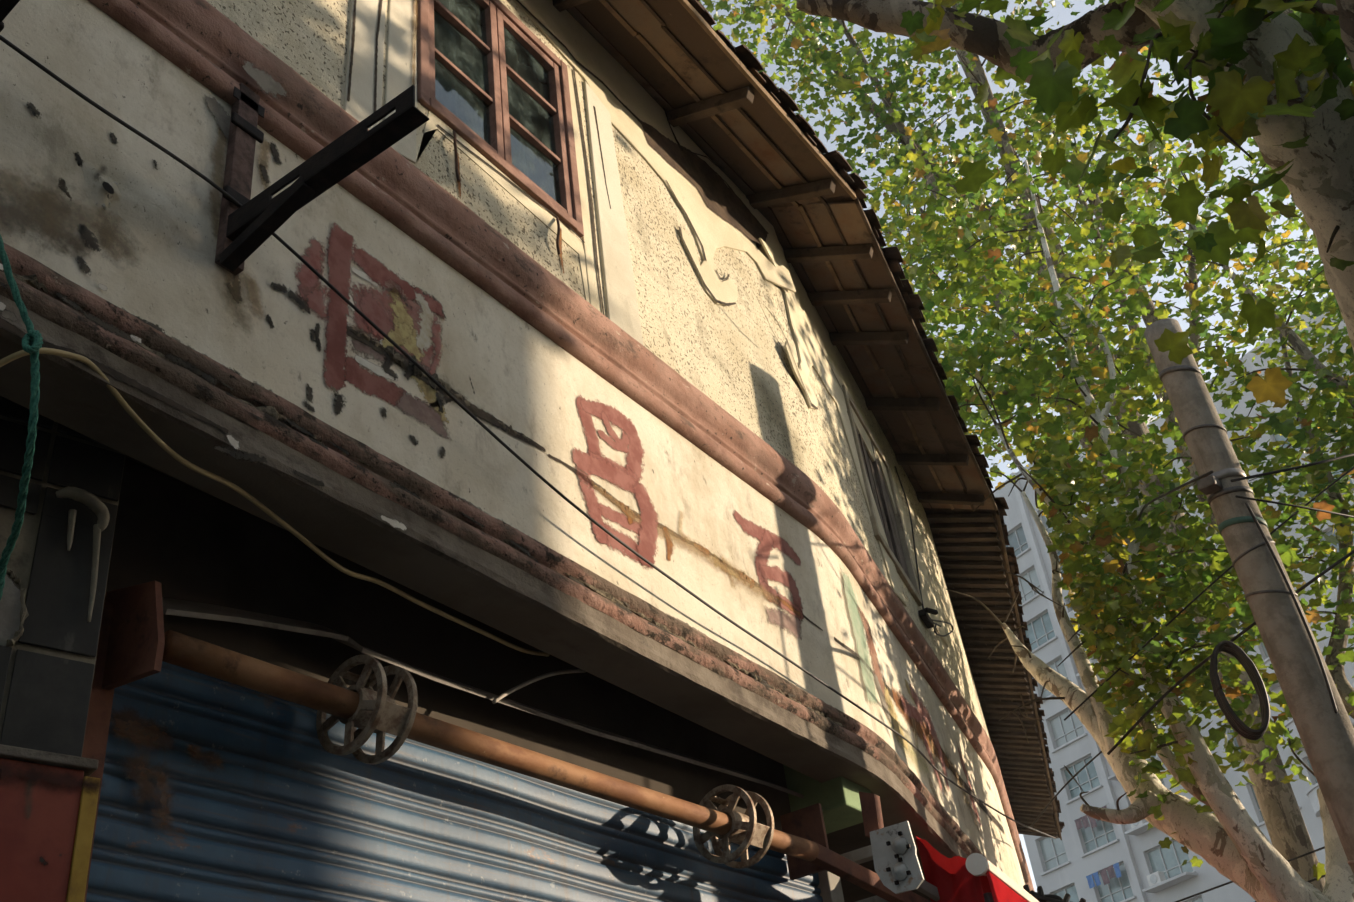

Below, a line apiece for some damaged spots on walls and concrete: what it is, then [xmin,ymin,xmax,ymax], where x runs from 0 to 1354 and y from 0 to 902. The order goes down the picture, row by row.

water stain [0,176,131,274]
spalling [381,515,407,530]
spalling [565,573,846,728]